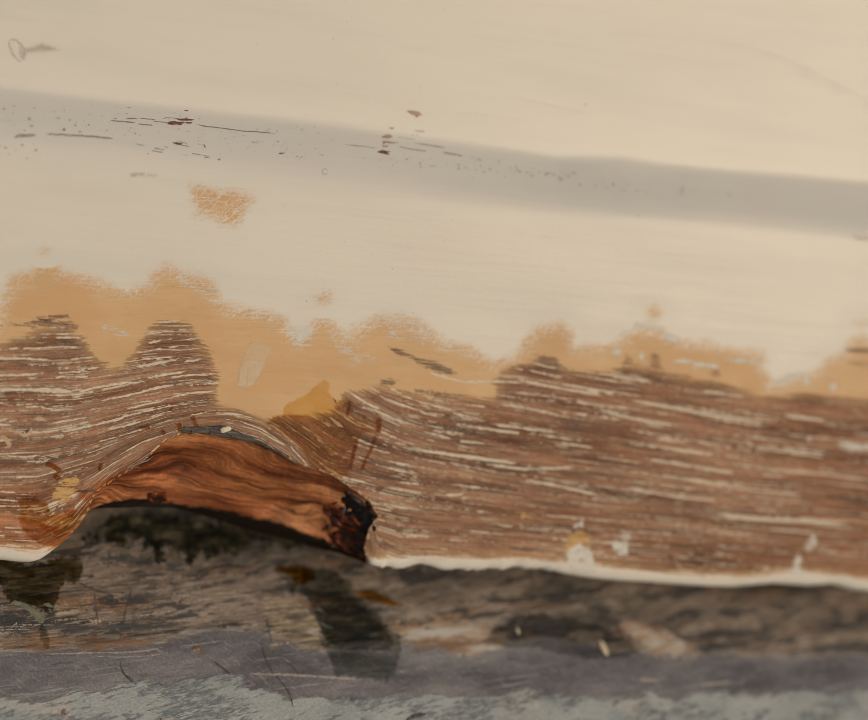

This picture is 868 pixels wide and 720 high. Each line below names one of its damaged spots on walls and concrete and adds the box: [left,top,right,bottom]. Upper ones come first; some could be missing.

peeling [170,159,272,247]
peeling [0,245,868,663]